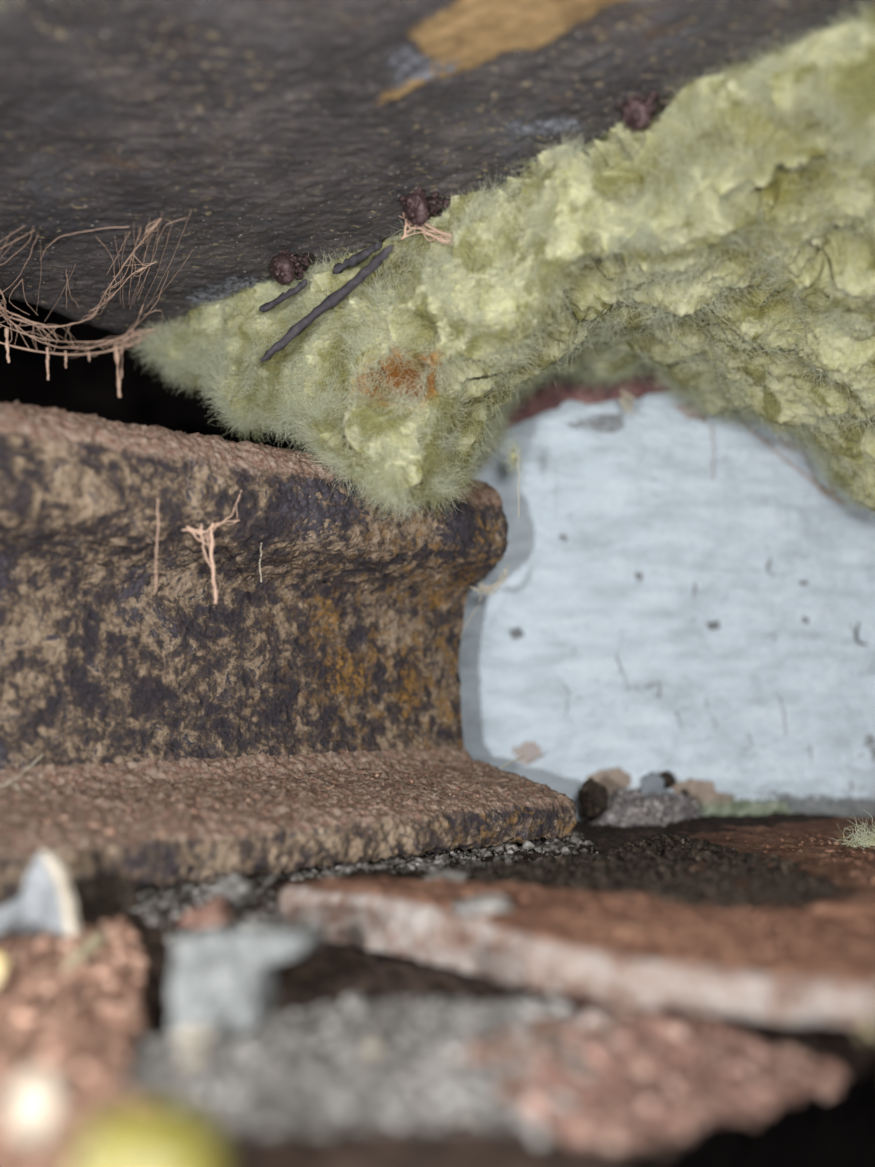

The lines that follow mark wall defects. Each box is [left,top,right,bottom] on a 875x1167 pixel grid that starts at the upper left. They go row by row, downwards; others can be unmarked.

corrosion [307,598,369,704]